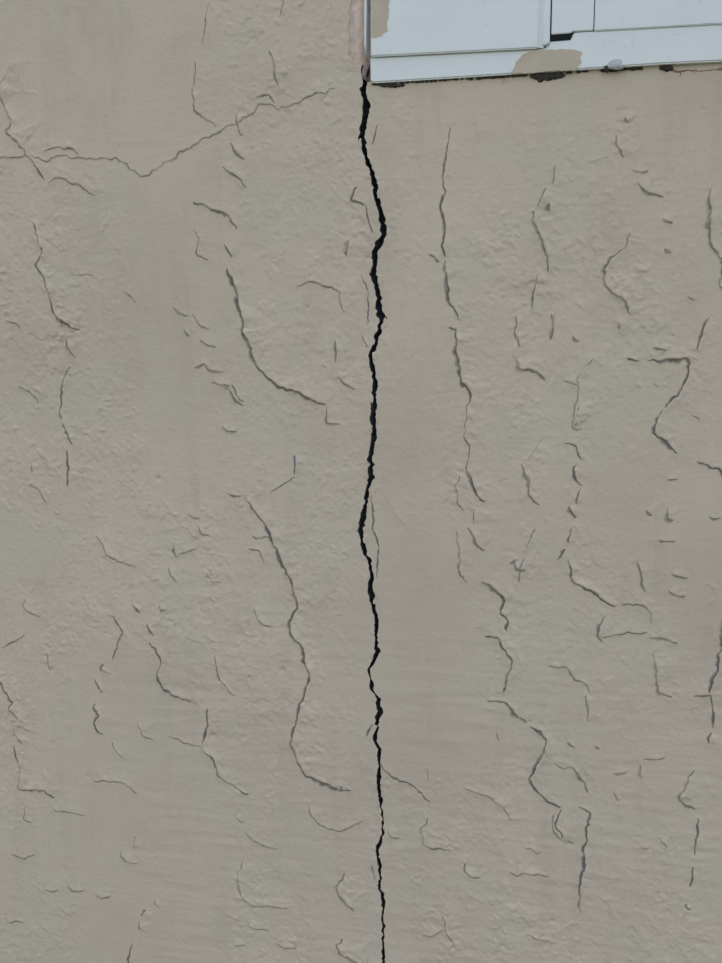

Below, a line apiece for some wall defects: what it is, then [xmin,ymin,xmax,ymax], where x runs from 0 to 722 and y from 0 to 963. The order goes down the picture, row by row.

crack [0,83,335,180]
crack [33,221,80,486]
crack [193,199,326,405]
crack [429,127,487,503]
crack [627,317,722,477]
crack [349,64,432,963]
crack [557,439,617,607]
crack [0,633,55,798]
crack [92,614,249,795]
crack [228,490,351,792]
crack [481,579,595,914]
crack [706,620,722,744]